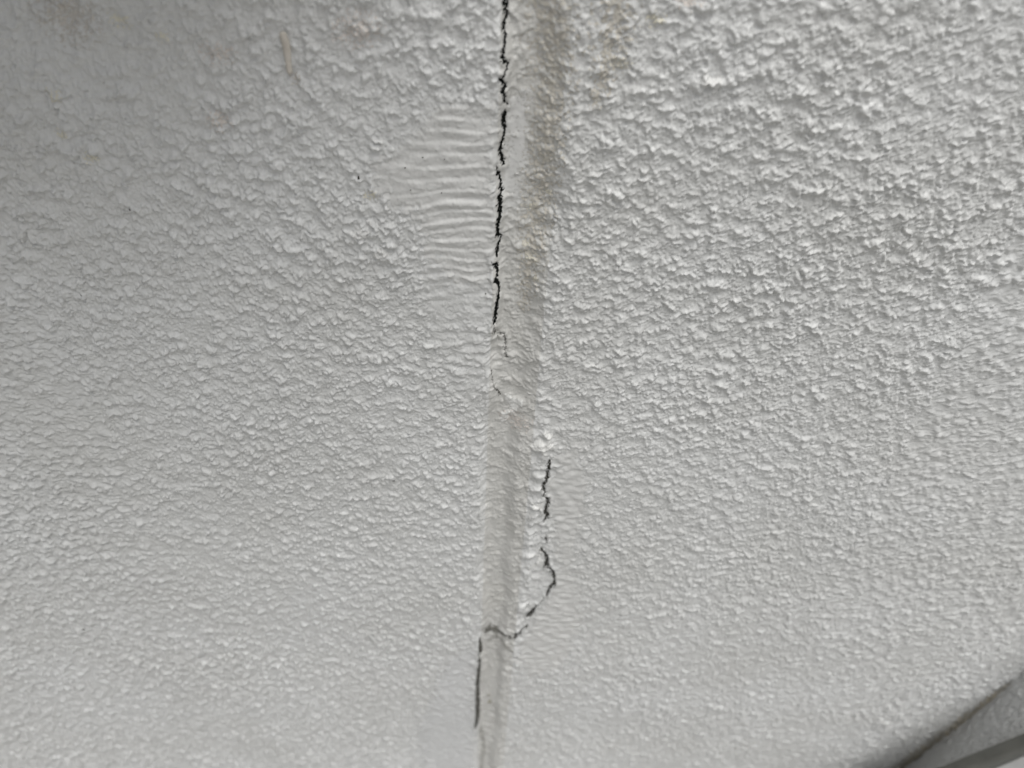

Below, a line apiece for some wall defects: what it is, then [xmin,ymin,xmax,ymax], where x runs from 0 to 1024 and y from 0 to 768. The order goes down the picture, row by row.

crack [490,0,509,395]
crack [474,460,557,729]